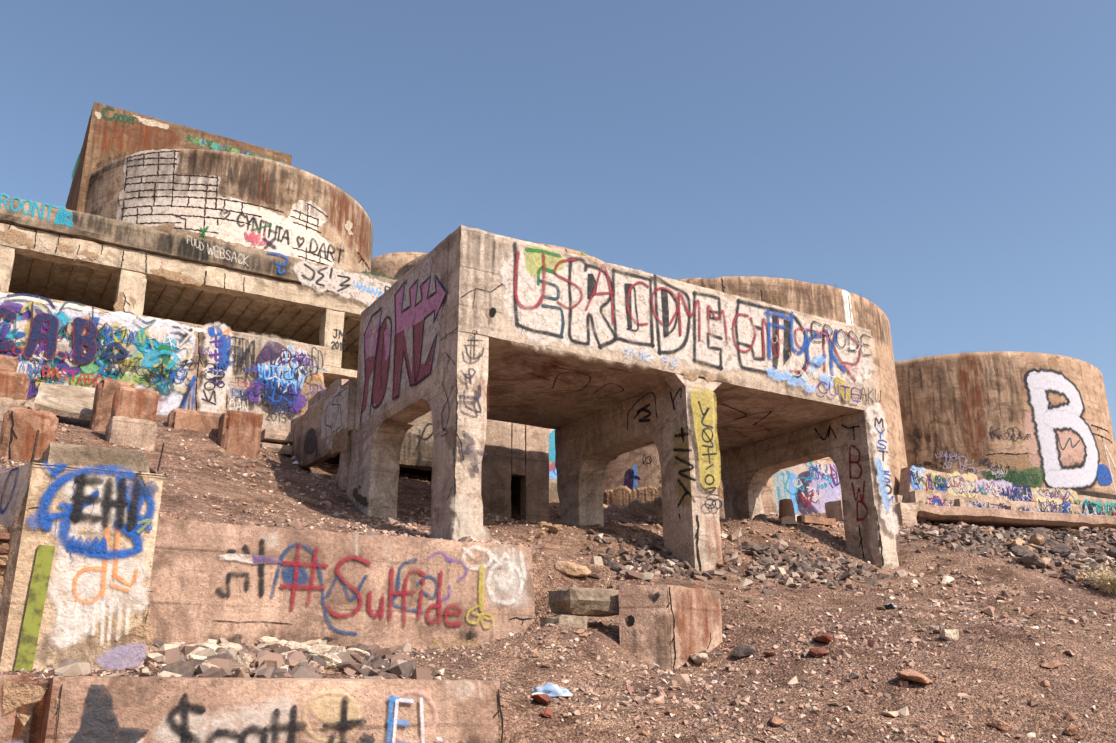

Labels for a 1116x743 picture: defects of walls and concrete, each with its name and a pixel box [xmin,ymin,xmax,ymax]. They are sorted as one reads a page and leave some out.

crack [694,515,702,571]
crack [667,586,676,669]